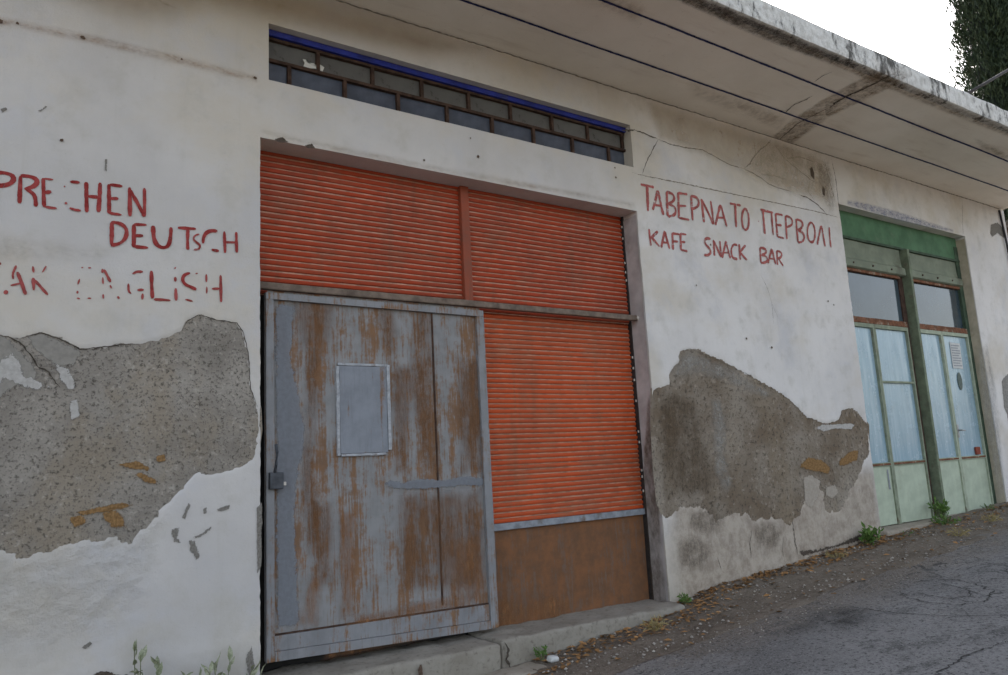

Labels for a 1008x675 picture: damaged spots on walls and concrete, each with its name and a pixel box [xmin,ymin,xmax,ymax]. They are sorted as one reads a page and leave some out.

flaking render [0,314,262,560]
flaking render [650,348,870,526]